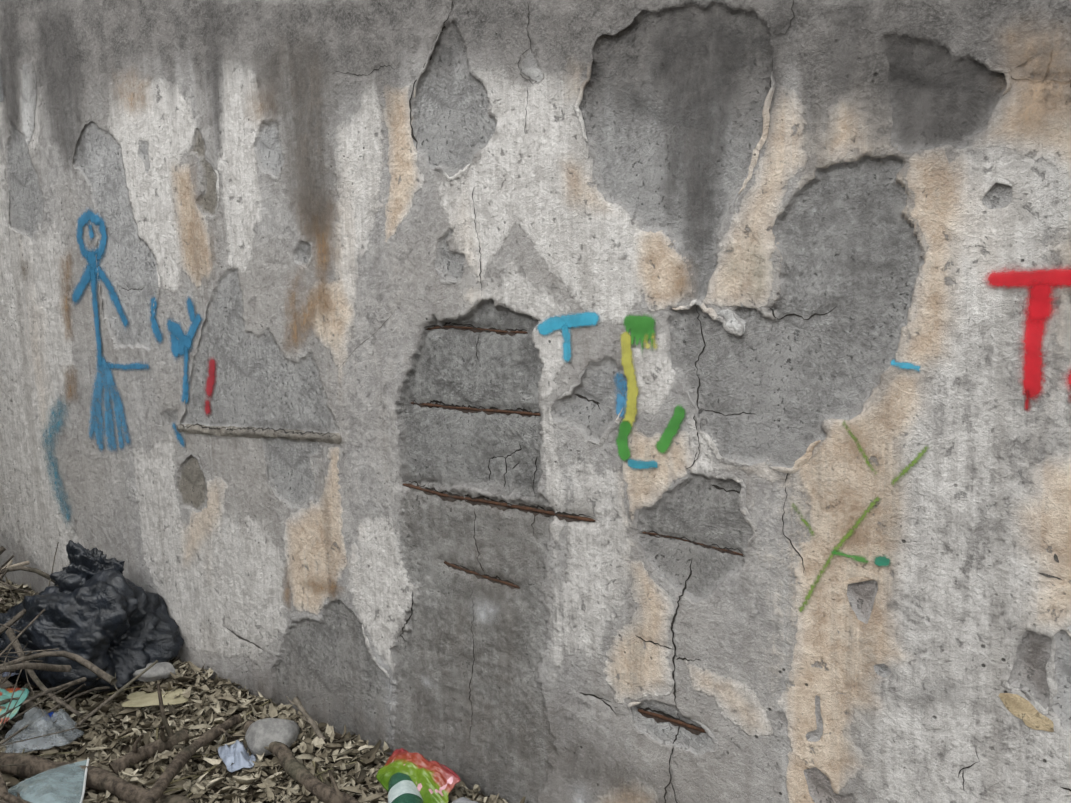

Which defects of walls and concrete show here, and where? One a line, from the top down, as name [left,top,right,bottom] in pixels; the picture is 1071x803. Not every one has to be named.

flaking render [412,20,497,181]
crack [687,307,753,471]
flaking render [575,1,1012,603]
crack [770,306,837,320]
spalling [272,299,628,803]
crack [637,561,700,803]
flaking render [999,630,1071,732]